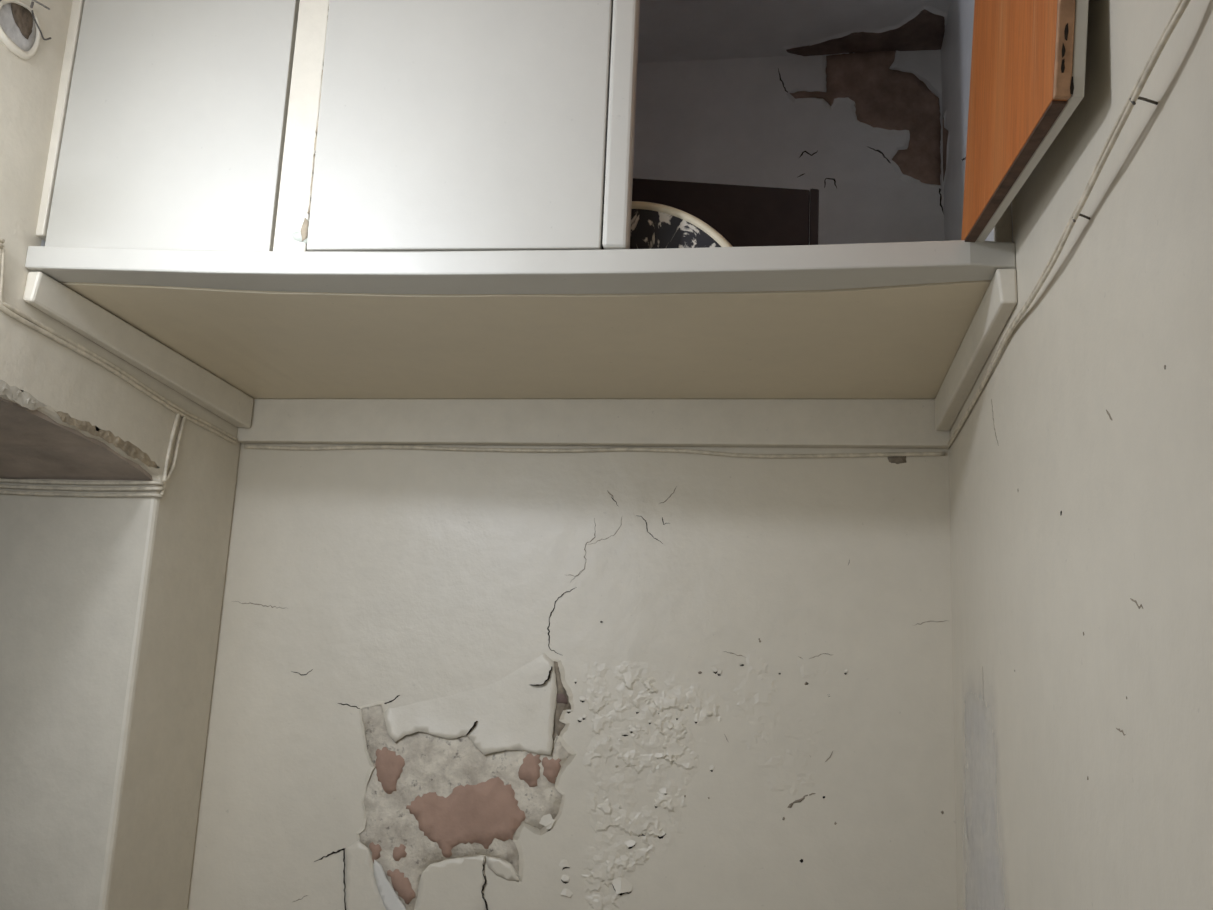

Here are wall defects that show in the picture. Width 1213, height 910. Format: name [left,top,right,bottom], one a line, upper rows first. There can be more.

peeling [778,5,950,214]
spalling [0,379,159,468]
crack [547,488,676,654]
peeling [314,653,576,910]